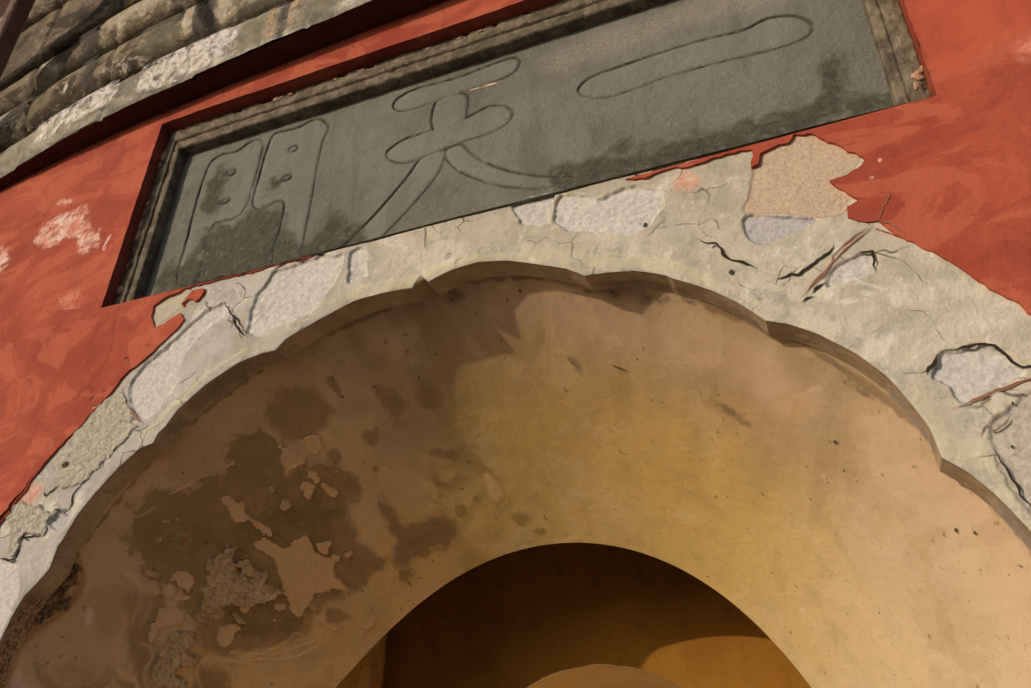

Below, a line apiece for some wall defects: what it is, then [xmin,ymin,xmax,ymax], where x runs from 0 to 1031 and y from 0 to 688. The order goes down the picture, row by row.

crack [193,256,314,339]
spalling [247,248,368,337]
spalling [512,187,663,235]
peeling [743,135,859,244]
crack [699,192,904,302]
spalling [824,255,876,287]
spalling [128,288,231,422]
spalling [929,347,1025,404]
crack [926,343,1031,507]
spalling [988,394,1031,511]
flaking render [148,496,353,648]
damp [129,430,455,639]